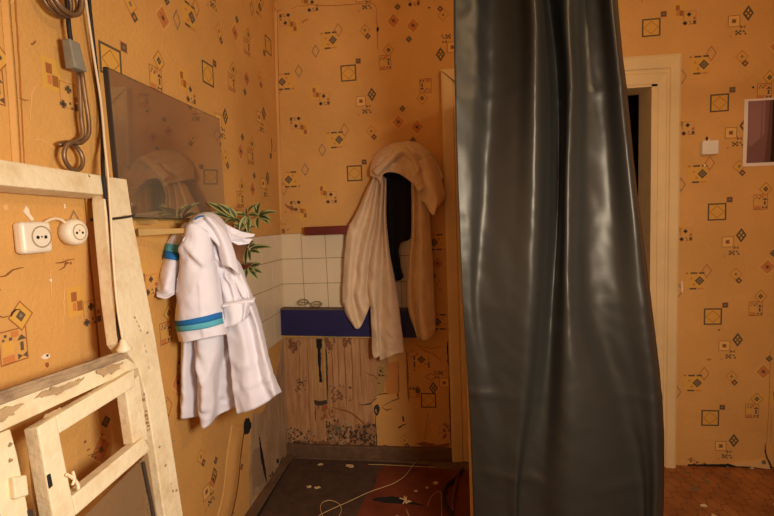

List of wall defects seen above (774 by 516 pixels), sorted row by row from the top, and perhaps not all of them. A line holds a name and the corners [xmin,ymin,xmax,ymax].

water stain [287,418,386,446]